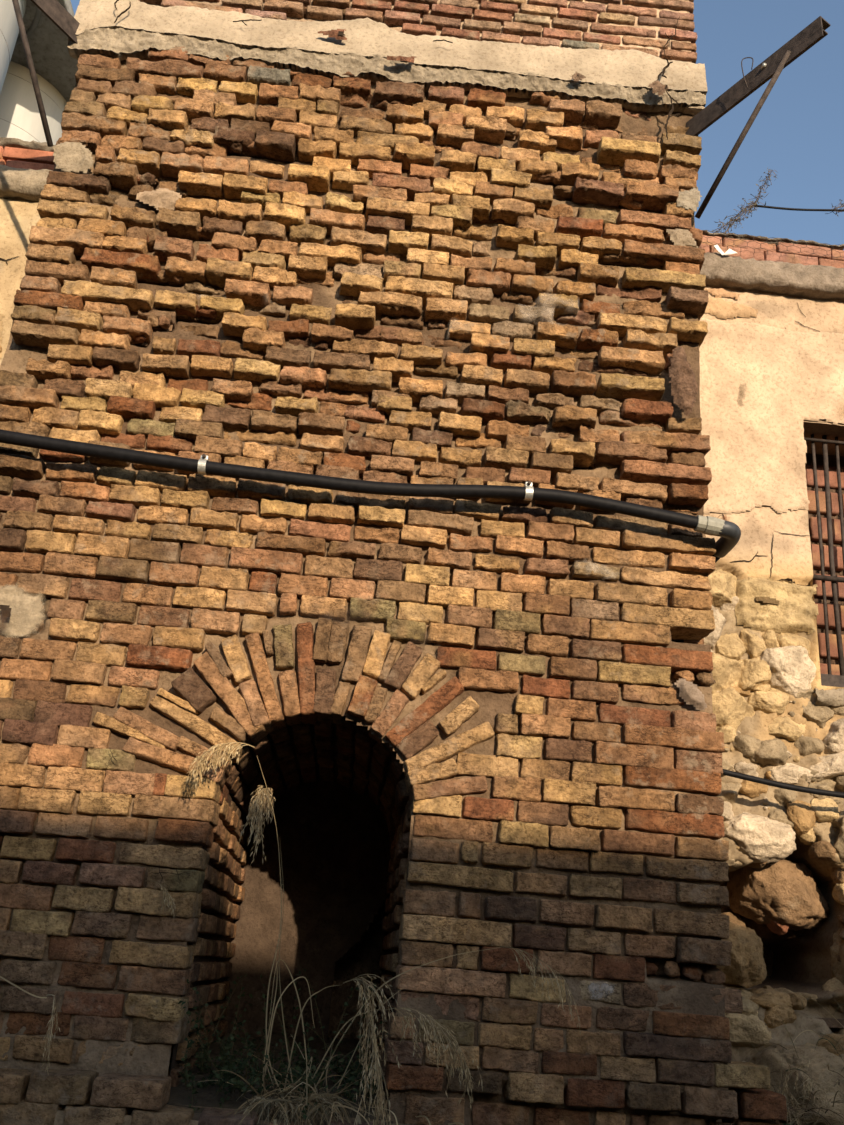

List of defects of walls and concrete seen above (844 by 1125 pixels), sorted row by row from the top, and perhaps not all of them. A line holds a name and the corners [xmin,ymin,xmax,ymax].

crack [657,17,682,140]
crack [732,531,812,586]